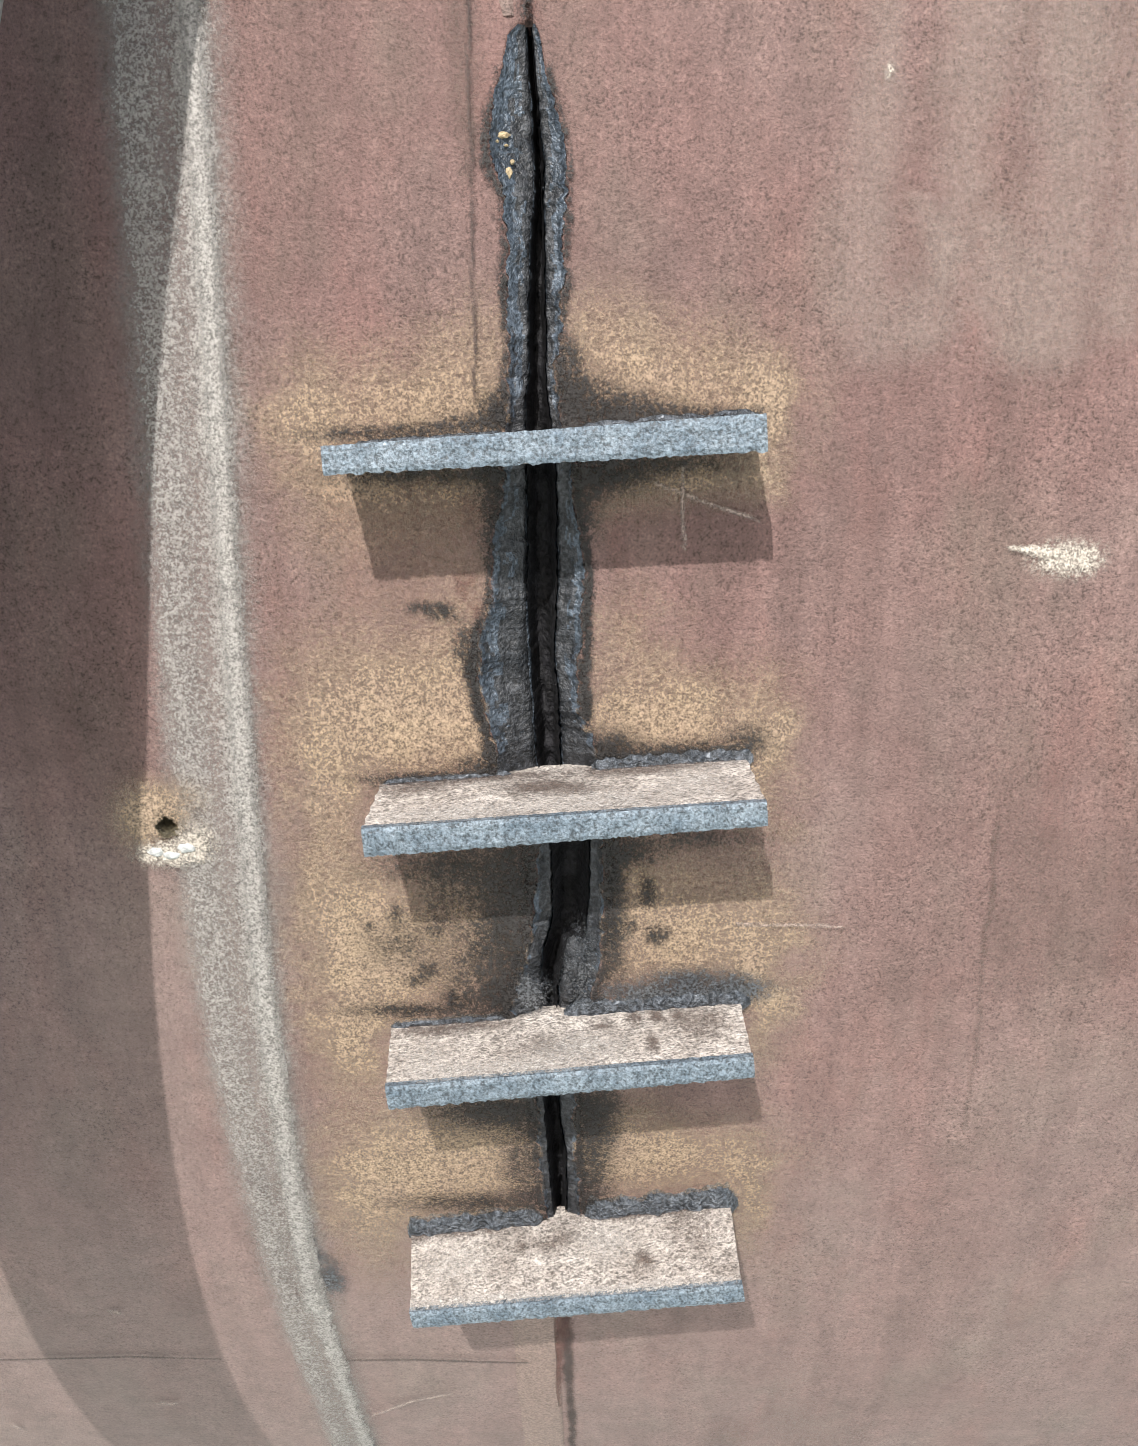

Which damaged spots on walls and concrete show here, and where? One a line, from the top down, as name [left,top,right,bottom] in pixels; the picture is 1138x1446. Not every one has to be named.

crack [519,0,561,768]
spalling [119,785,214,866]
crack [540,839,590,1009]
crack [544,1095,567,1216]